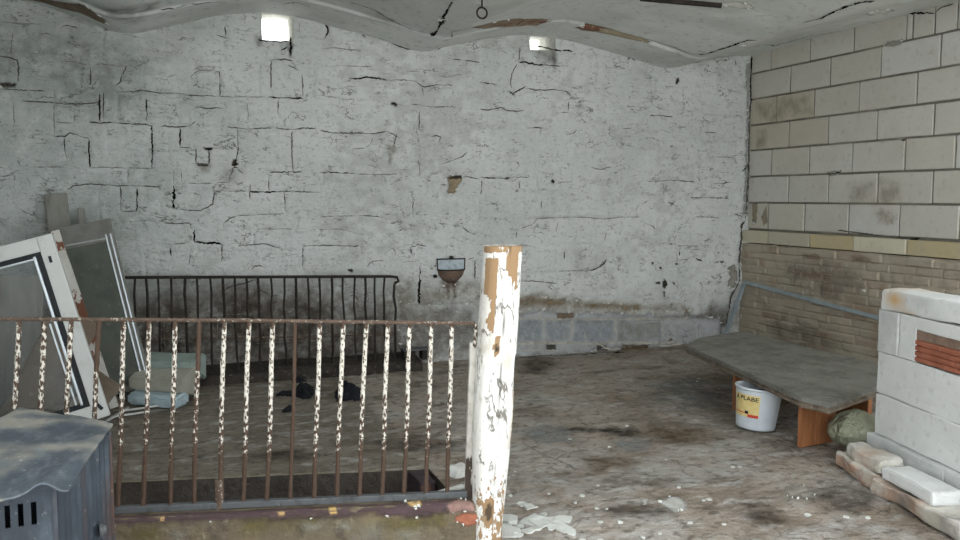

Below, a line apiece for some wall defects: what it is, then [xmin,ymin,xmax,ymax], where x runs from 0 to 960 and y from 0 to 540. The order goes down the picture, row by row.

spalling [474,19,551,29]
spalling [574,24,652,43]
crack [0,2,655,304]
crack [627,1,874,324]
spalling [447,175,462,195]